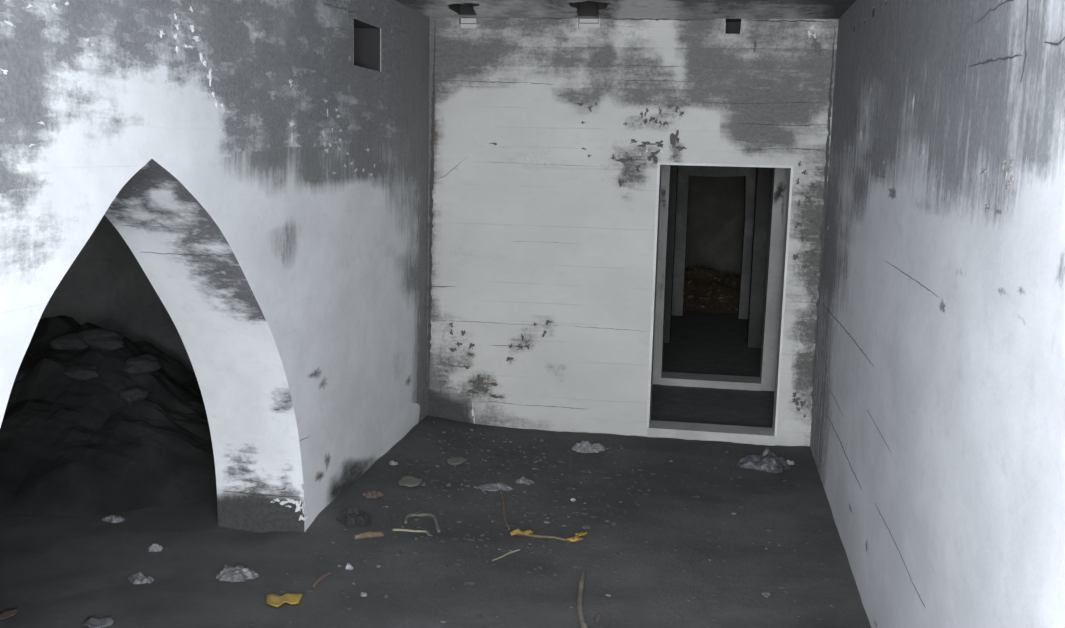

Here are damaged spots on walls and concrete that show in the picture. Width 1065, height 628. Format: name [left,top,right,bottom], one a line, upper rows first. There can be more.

leakage [0,166,37,209]
leakage [13,39,81,150]
leakage [106,190,224,298]
leakage [216,0,839,425]
spalling [611,104,687,172]
leakage [792,116,905,478]
leakage [927,157,1004,215]
spalling [449,323,503,424]